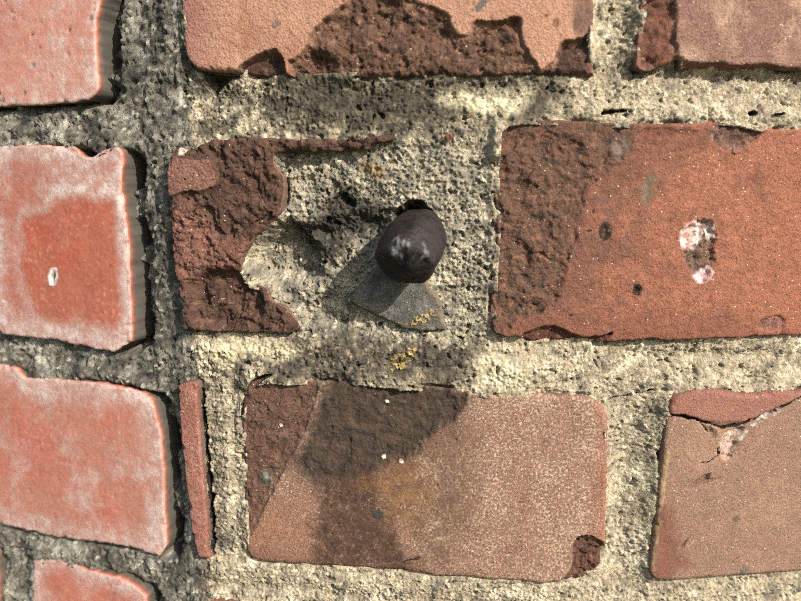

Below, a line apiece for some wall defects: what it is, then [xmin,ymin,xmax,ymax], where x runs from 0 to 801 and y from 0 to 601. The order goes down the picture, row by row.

spalling [234,0,593,78]
spalling [170,136,394,334]
crack [671,396,801,463]
spalling [560,535,605,581]